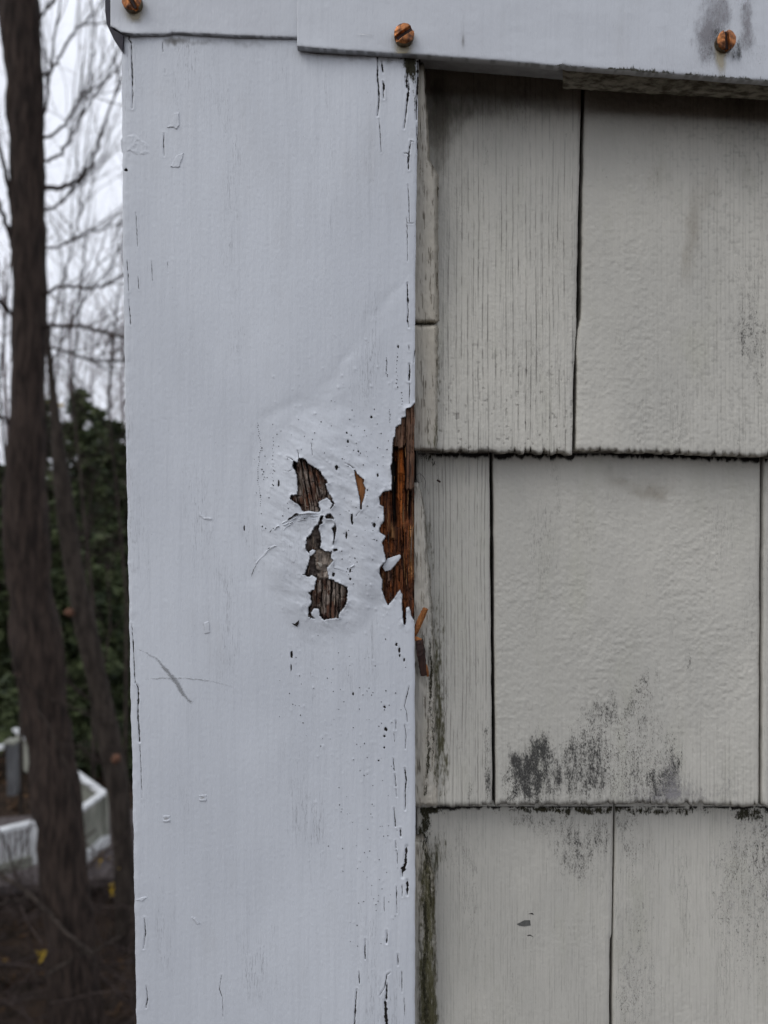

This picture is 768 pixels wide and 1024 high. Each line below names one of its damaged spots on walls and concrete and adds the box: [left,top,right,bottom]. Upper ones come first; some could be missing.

damp [732,2,752,60]
crack [377,57,419,323]
peeling [290,459,348,620]
peeling [355,471,366,509]
damp [503,679,681,803]